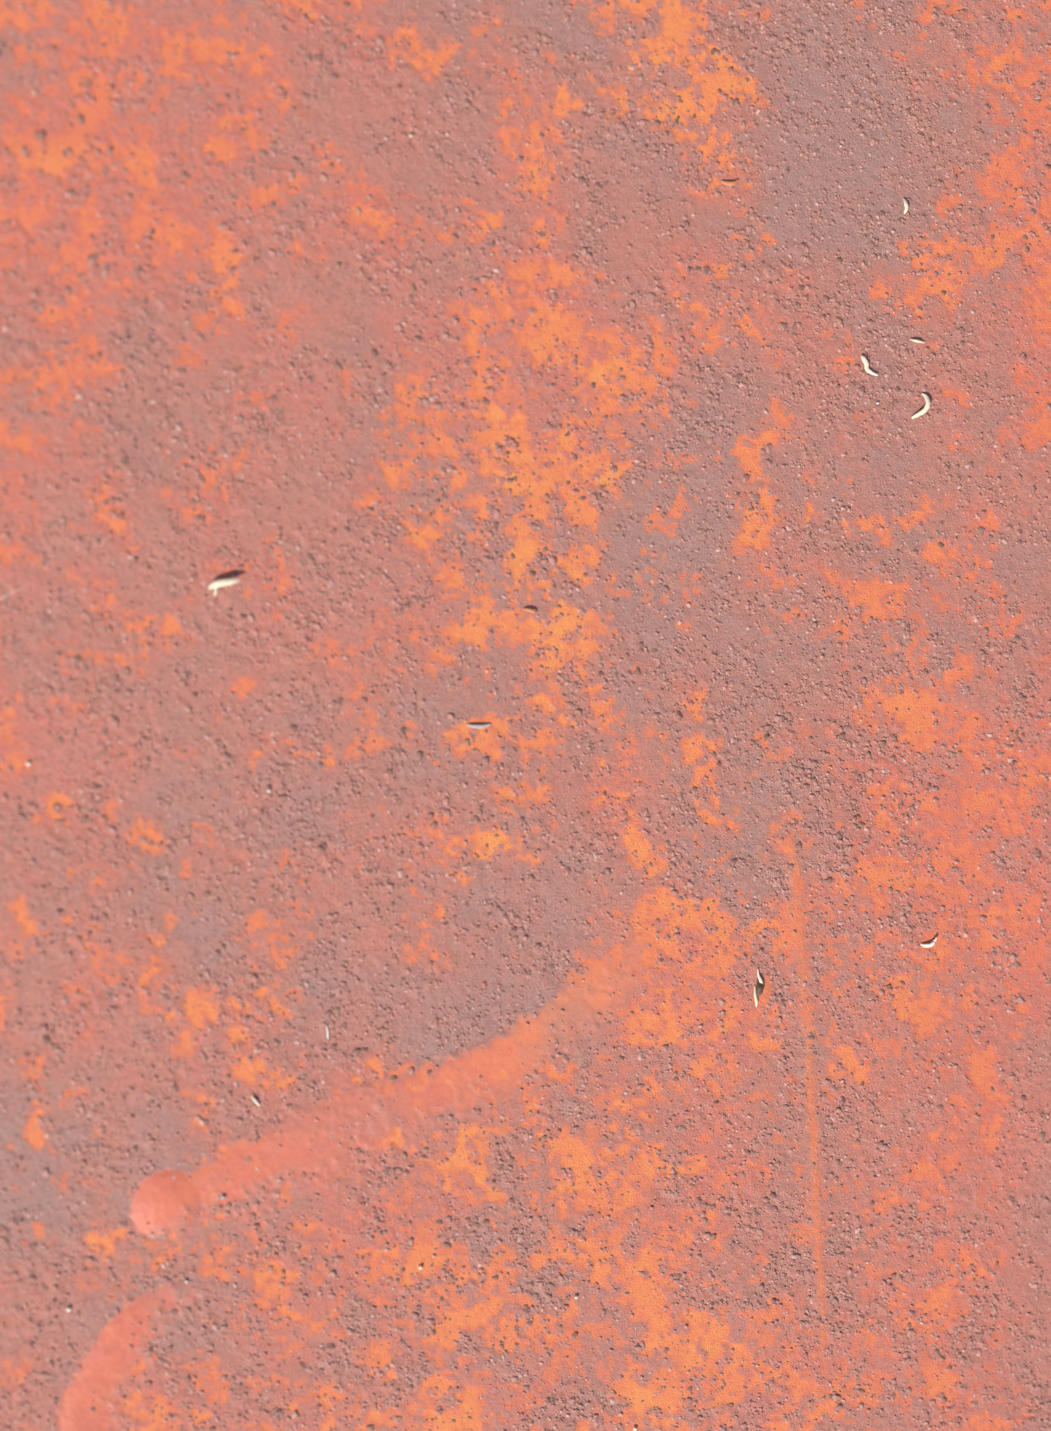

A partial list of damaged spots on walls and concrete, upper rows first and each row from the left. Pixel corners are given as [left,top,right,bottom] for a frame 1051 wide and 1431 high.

corrosion [863,0,1051,486]
corrosion [759,260,820,301]
corrosion [390,1066,432,1082]